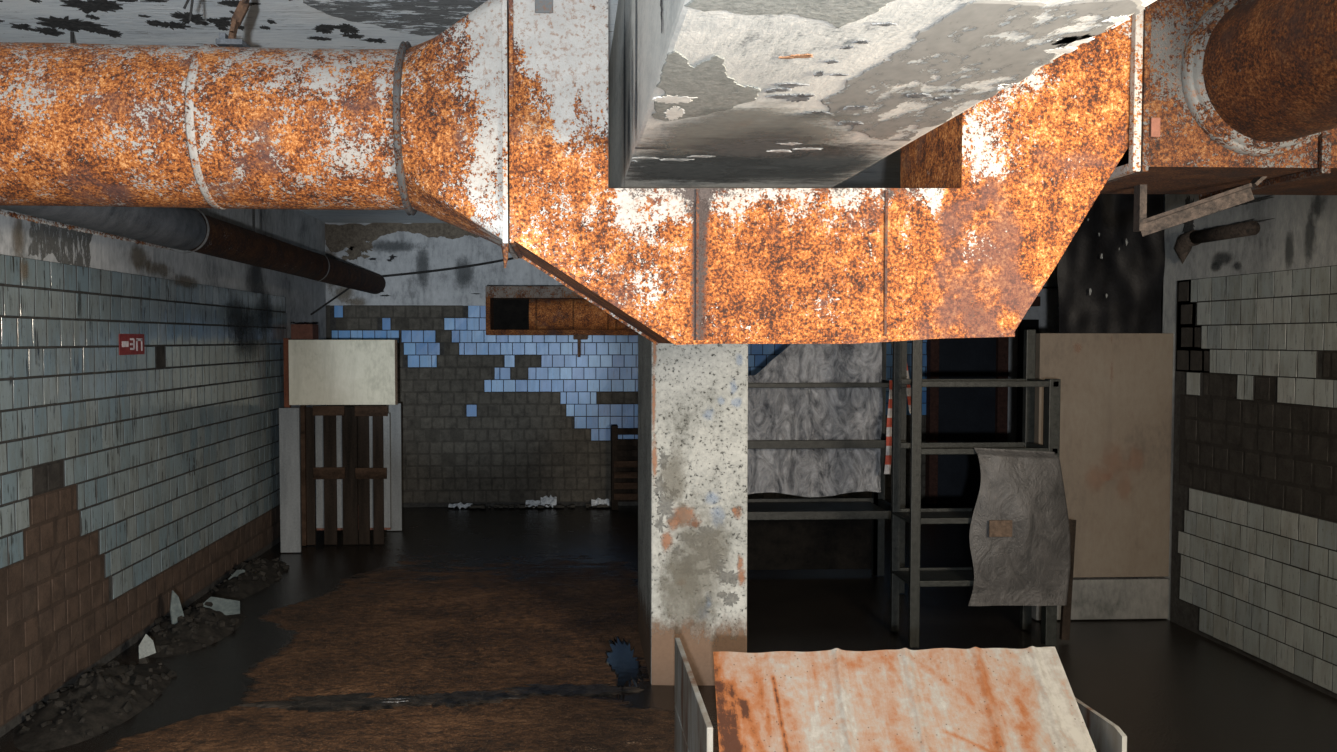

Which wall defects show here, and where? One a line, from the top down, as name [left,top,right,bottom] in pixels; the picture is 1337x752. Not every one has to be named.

peeling [0,0,277,38]
peeling [289,0,488,43]
spalling [651,0,1145,141]
peeling [630,155,715,167]
peeling [766,142,823,153]
peeling [327,305,611,503]
peeling [597,392,638,404]
peeling [1176,281,1337,522]
peeling [747,415,926,500]
peeling [0,460,280,727]